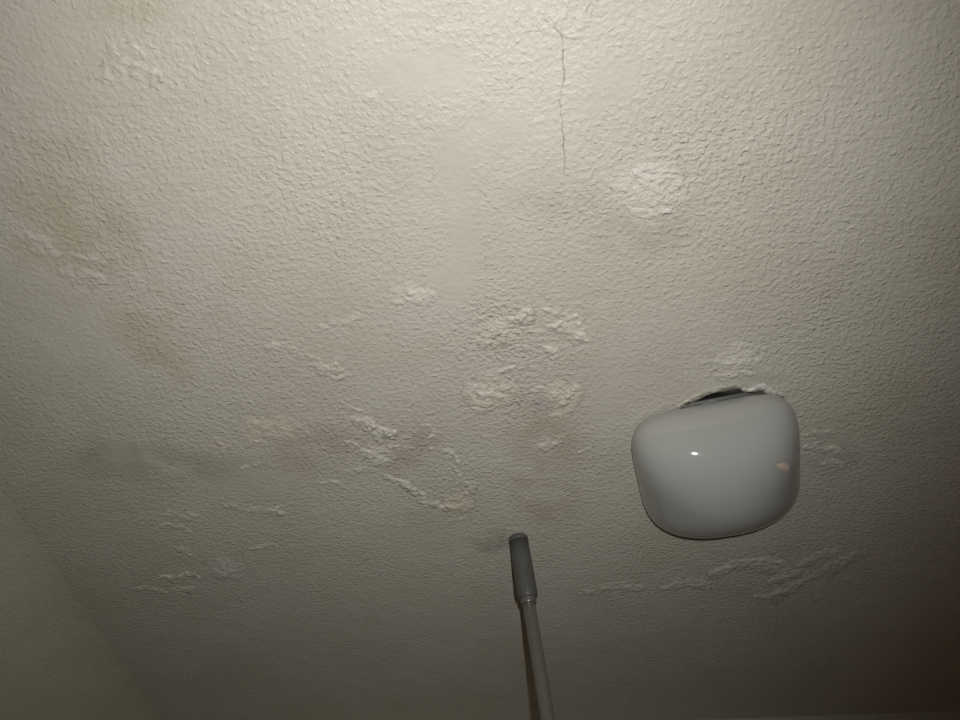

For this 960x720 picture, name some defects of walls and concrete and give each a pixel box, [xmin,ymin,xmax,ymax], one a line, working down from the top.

spalling [675,369,784,407]